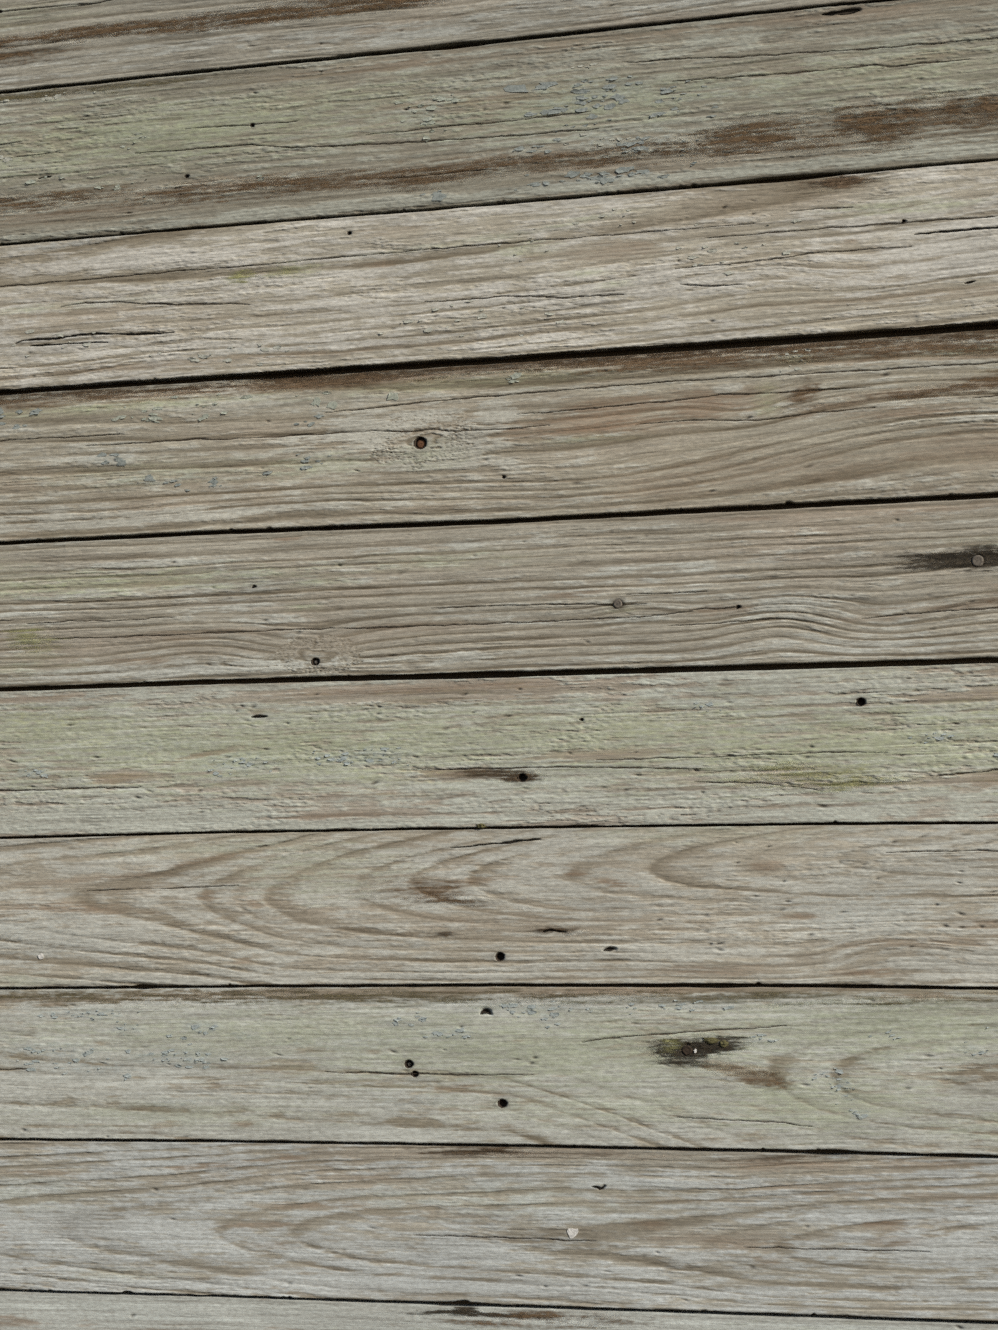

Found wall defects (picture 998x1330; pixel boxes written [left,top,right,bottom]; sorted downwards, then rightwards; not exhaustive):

peeling [503,63,670,191]